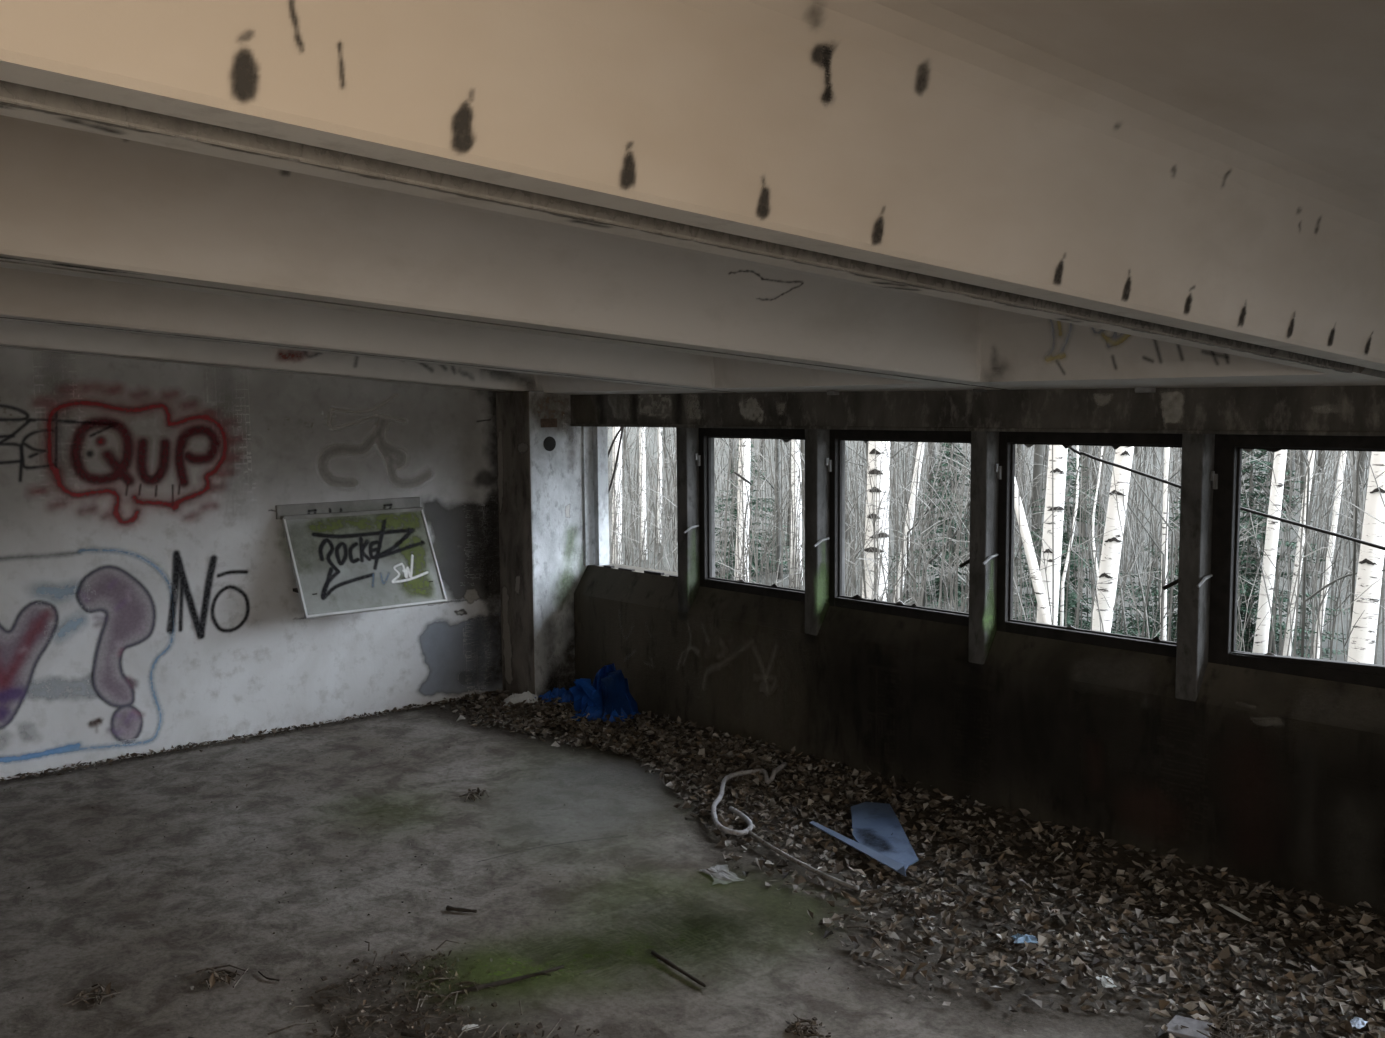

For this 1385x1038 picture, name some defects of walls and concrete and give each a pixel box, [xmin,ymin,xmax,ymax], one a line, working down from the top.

crack [729,270,803,300]
damp [0,370,533,696]